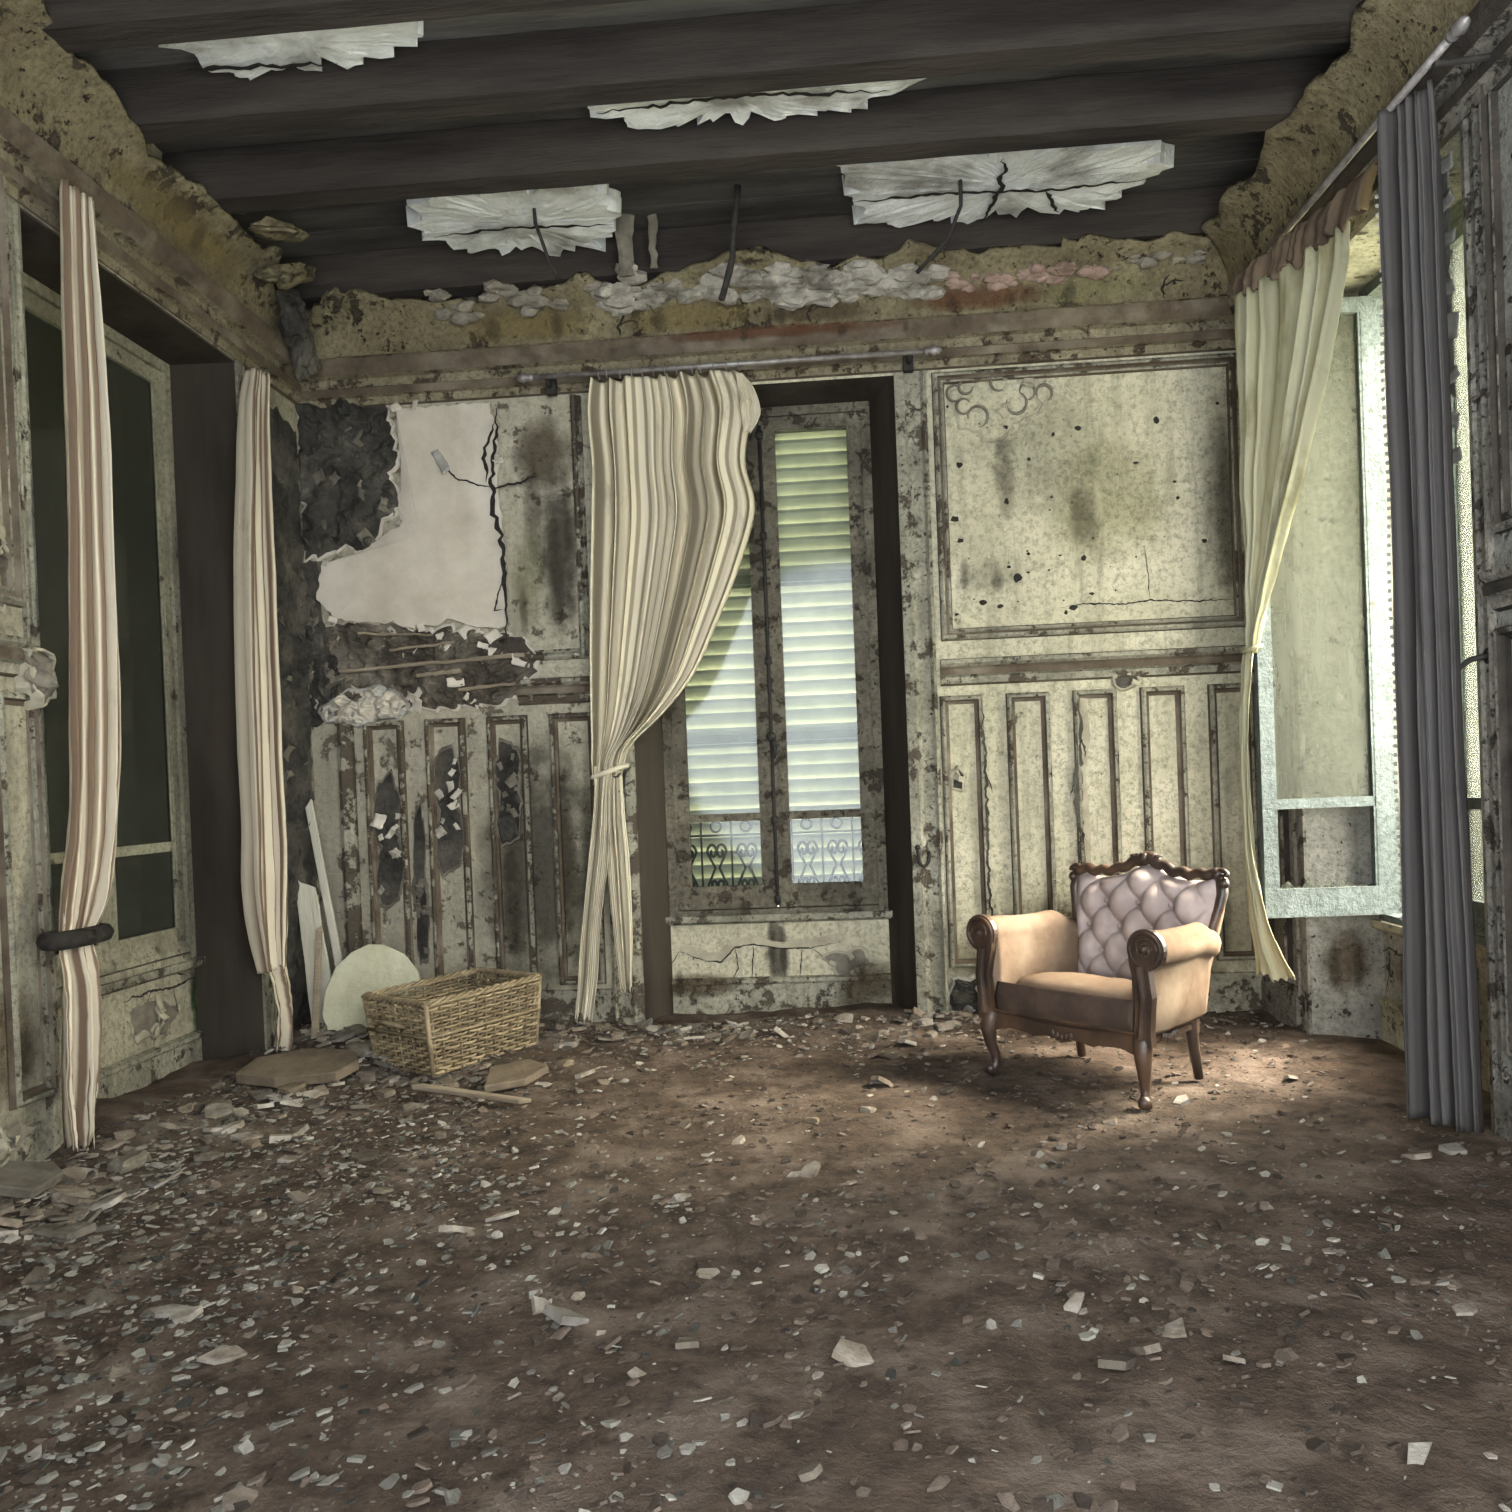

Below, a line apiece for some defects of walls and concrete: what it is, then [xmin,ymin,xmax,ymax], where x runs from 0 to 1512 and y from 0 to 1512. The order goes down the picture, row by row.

flaking render [158,21,423,80]
flaking render [587,78,926,129]
flaking render [837,140,1174,228]
flaking render [406,184,1206,316]
flaking render [423,279,570,326]
peeling [1441,149,1462,464]
water stain [519,426,563,480]
peeling [0,523,15,613]
crack [448,405,538,641]
water stain [541,499,573,607]
flaking render [270,399,547,1029]